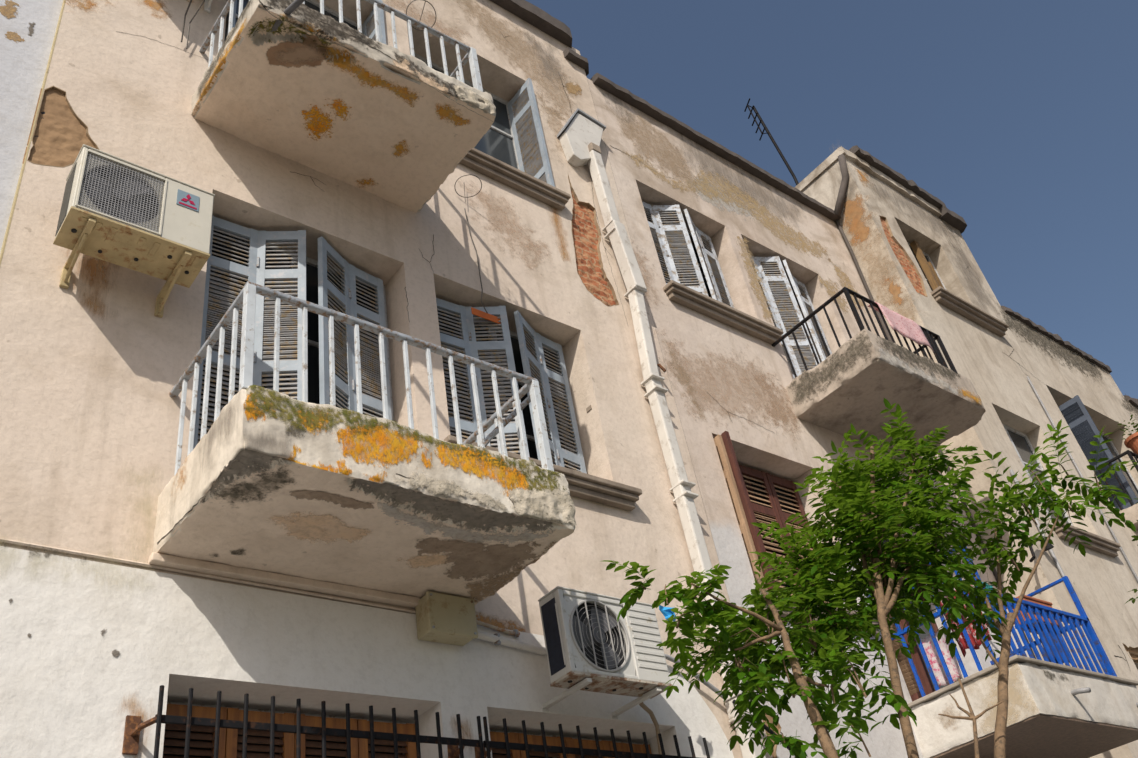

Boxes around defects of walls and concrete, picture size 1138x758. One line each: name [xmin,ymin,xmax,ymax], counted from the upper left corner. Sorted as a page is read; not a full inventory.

peeling [0,0,35,43]
flaking render [22,86,99,167]
flaking render [568,175,619,306]
flaking render [843,196,927,305]
leakage [669,334,960,421]
leakage [213,468,294,503]